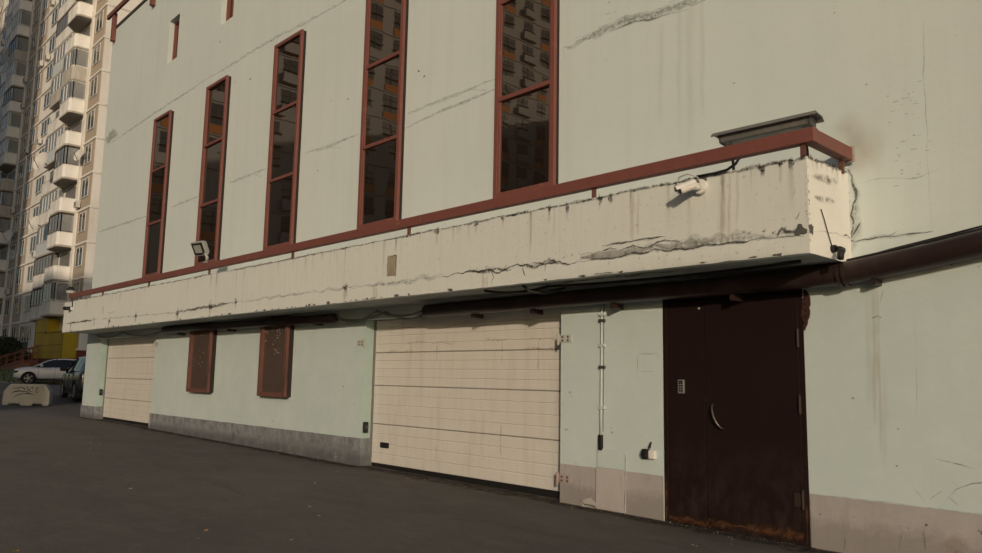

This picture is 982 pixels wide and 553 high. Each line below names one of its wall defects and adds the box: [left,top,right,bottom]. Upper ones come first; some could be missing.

crack [572,2,685,42]
water stain [713,155,846,182]
water stain [70,177,701,302]
spalling [580,170,814,262]
crack [843,170,932,248]
peeling [499,269,688,289]
corrosion [665,479,808,544]